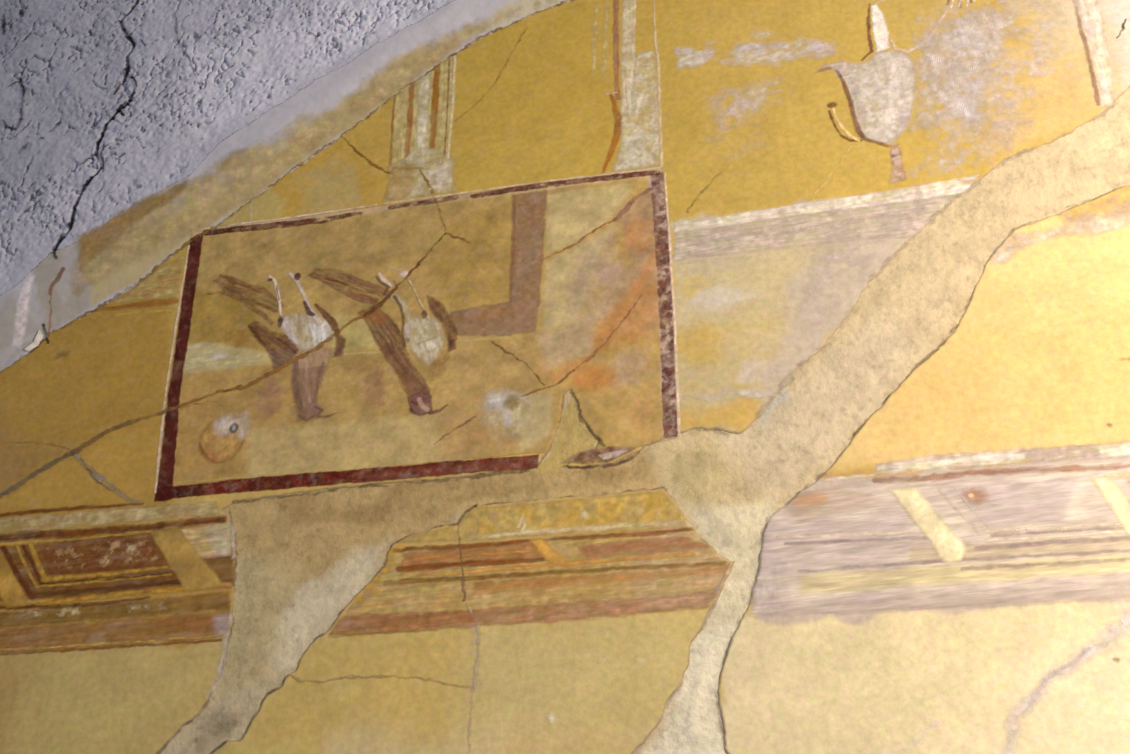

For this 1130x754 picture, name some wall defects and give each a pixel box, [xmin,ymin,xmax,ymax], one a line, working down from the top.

crack [2,77,61,148]
crack [14,0,573,363]
crack [556,188,654,253]
peeling [25,330,43,351]
crack [0,170,470,503]
crack [491,302,637,396]
flaking render [158,88,1130,754]
crack [292,674,389,683]
crack [417,538,481,735]